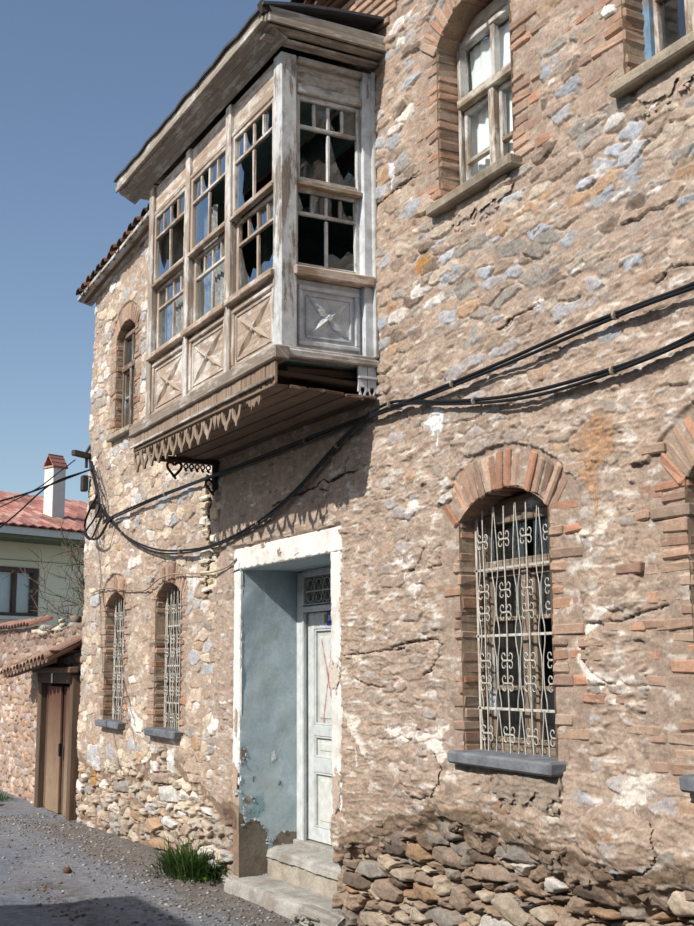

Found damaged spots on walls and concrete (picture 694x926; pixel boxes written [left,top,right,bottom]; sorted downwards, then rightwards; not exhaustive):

crack [273,470,358,507]
crack [344,638,444,676]
spalling [231,745,297,878]